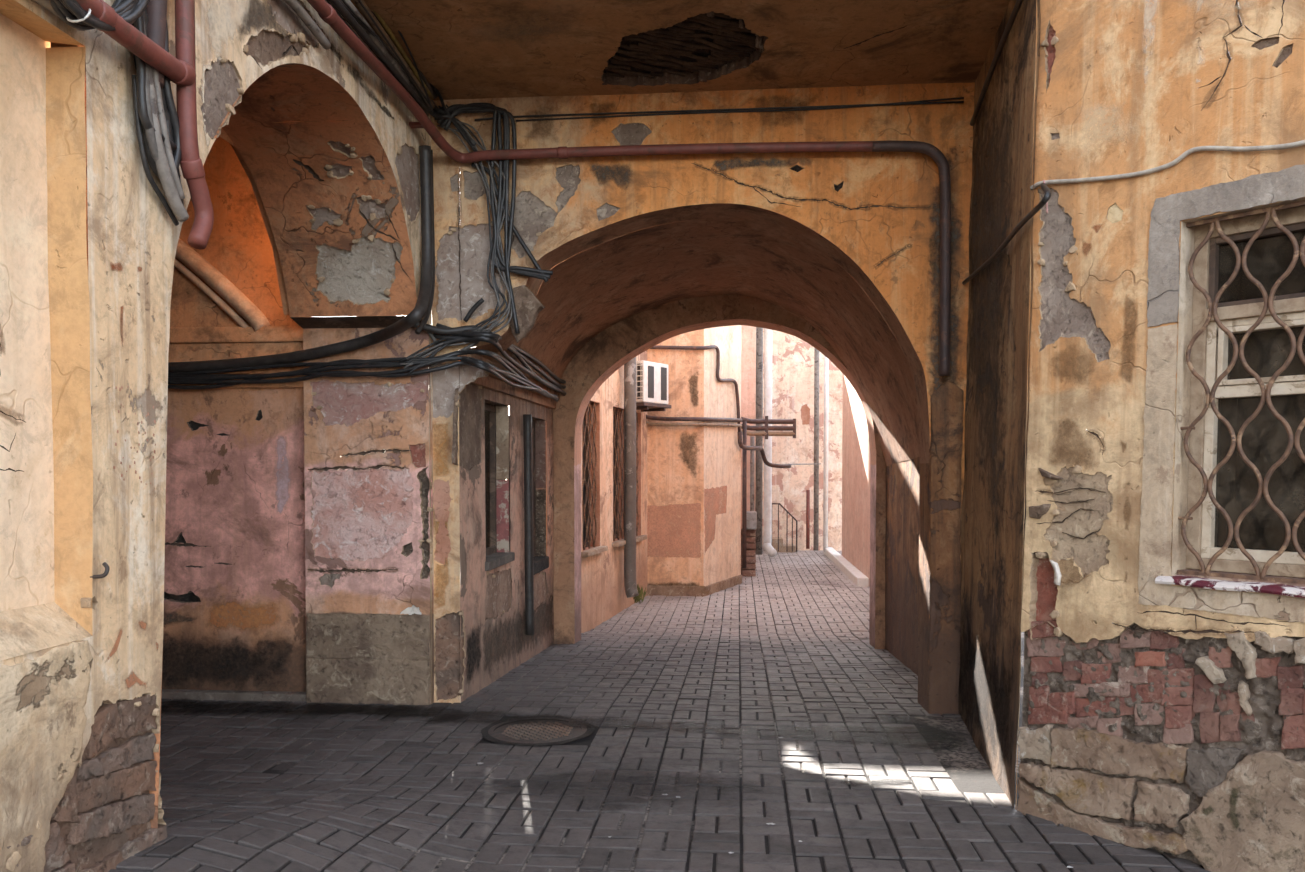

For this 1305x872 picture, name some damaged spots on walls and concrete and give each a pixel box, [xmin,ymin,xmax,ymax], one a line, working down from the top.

spalling [200,0,327,145]
crack [1199,0,1285,111]
spalling [306,140,421,305]
spalling [596,203,621,221]
crack [692,163,934,210]
spalling [1037,188,1111,362]
crack [308,449,411,471]
crack [165,542,233,568]
crack [307,566,398,574]
leakage [162,612,293,688]
flaking render [1017,465,1305,872]
spalling [6,692,167,872]